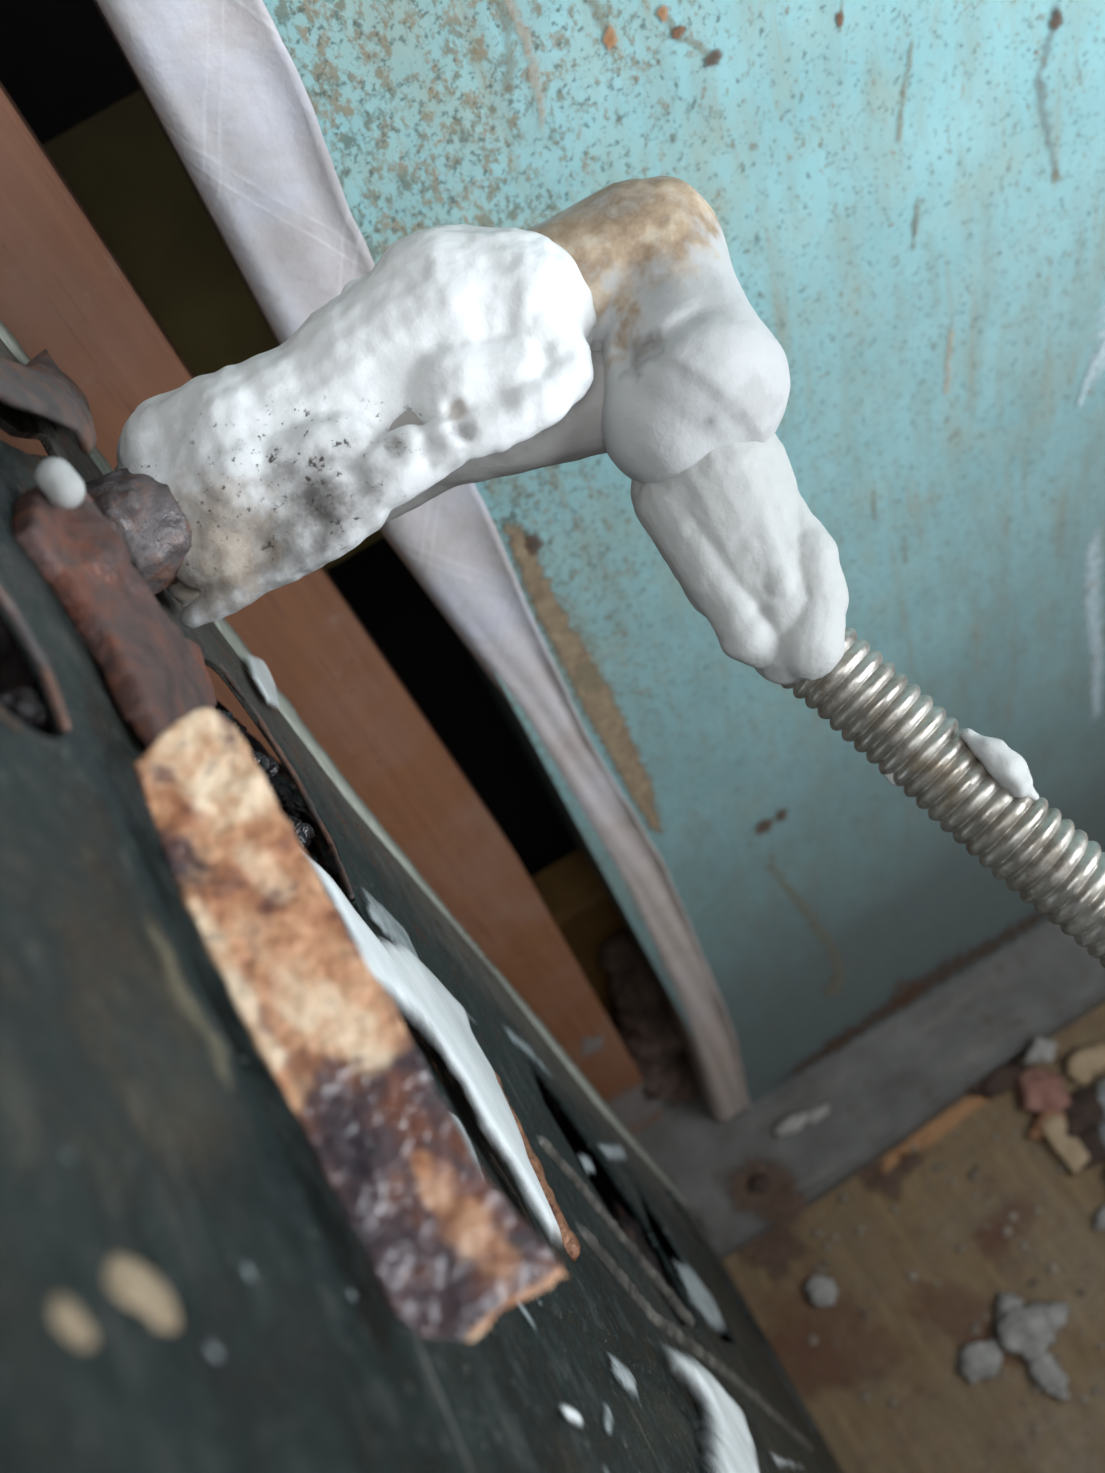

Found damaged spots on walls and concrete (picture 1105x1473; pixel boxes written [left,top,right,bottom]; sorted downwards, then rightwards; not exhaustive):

corrosion [658,5,686,38]
corrosion [604,25,618,50]
corrosion [705,50,722,67]